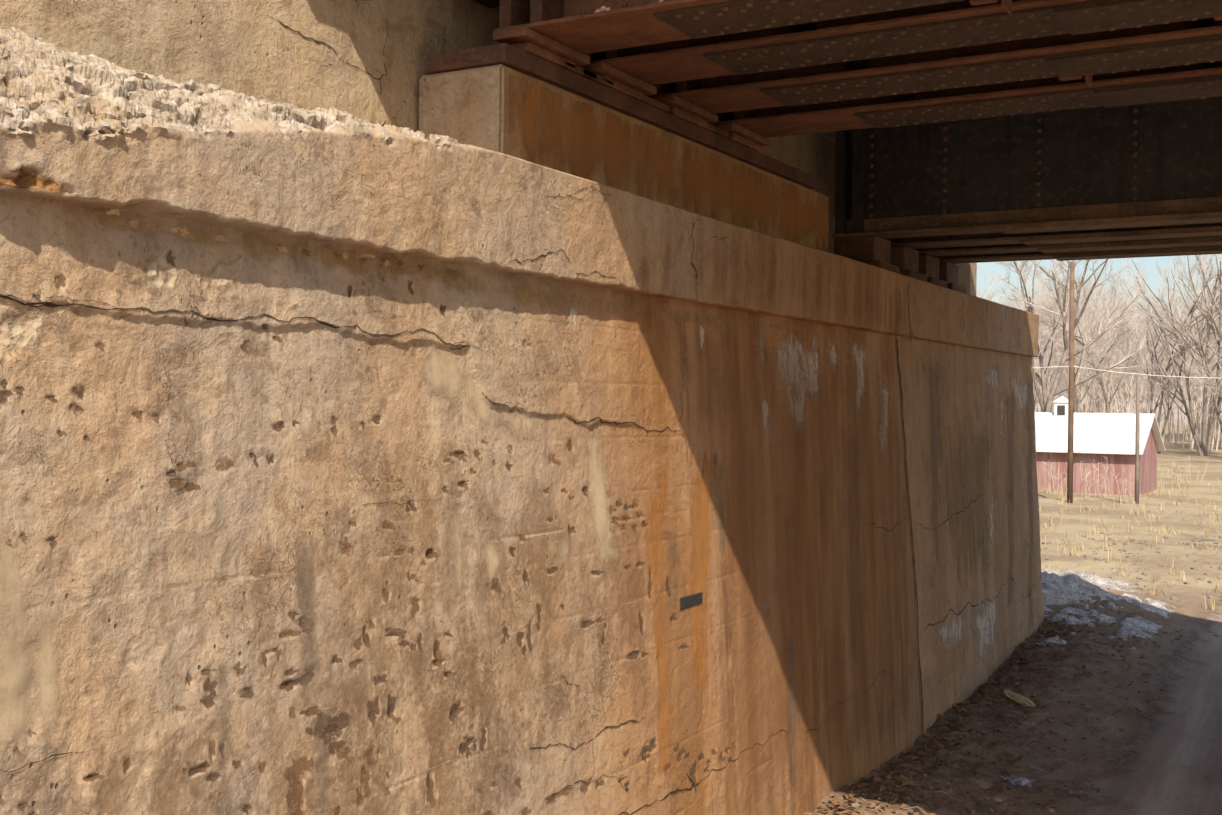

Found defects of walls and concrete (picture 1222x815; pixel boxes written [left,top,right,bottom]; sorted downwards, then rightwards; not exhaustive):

spalling [0,27,456,149]
crack [267,15,388,95]
spalling [0,294,42,360]
crack [0,294,482,351]
crack [482,393,522,414]
water stain [759,323,840,427]
water stain [853,342,868,411]
crack [528,308,1033,815]
peeling [262,611,315,691]
peeling [332,620,454,677]
water stain [939,594,996,668]
peeling [367,675,401,726]